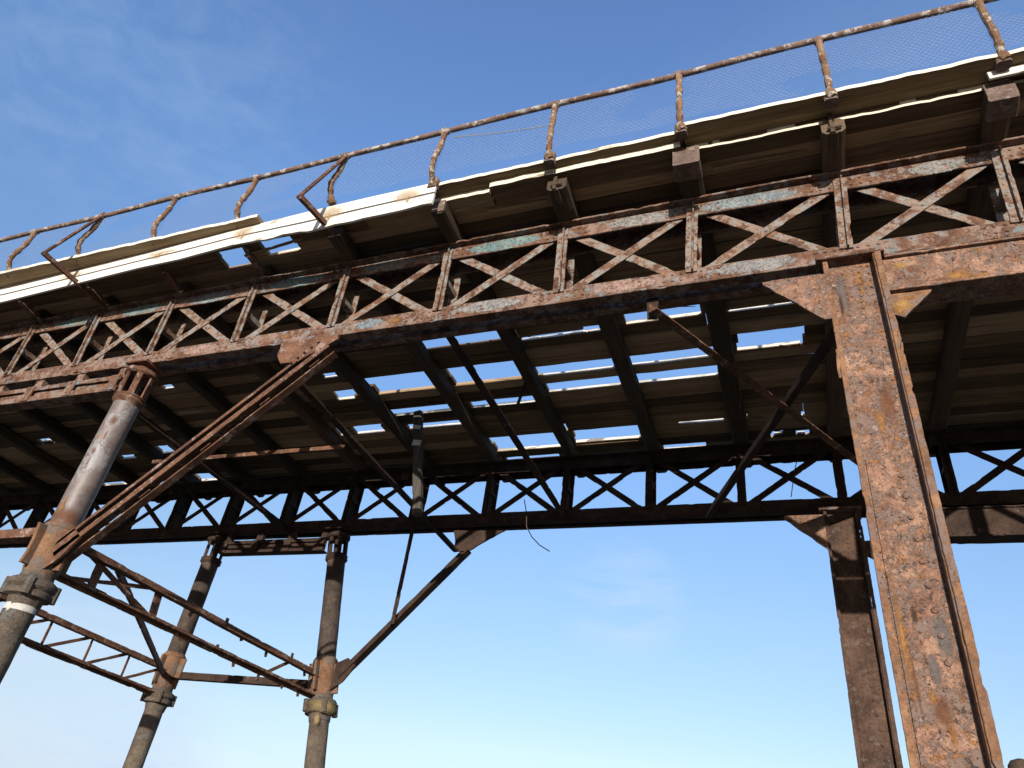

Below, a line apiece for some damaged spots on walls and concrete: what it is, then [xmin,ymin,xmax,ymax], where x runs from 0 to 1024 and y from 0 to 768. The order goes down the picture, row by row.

peeling [905,157,974,174]
peeling [700,189,797,211]
peeling [607,210,675,228]
peeling [703,256,798,274]
rust [935,271,989,280]
rust [896,605,957,744]